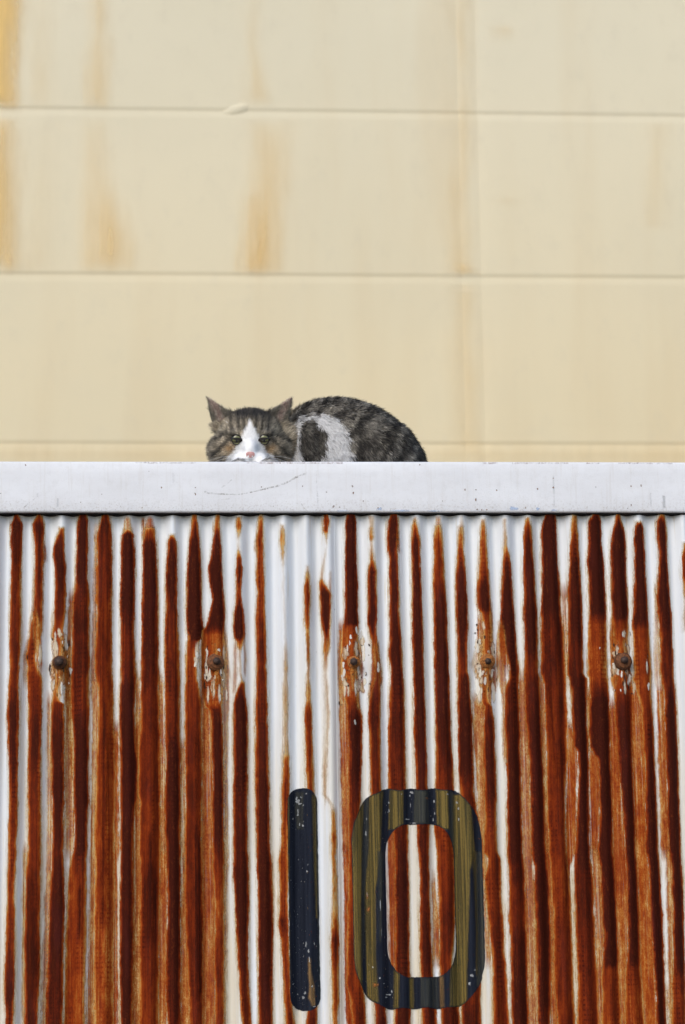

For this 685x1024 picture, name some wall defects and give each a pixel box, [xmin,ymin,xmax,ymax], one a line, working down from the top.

damp [0,0,15,101]
peeling [194,644,228,701]
peeling [339,627,380,705]
peeling [475,622,497,702]
rust [3,502,318,1024]
rust [304,489,685,1024]